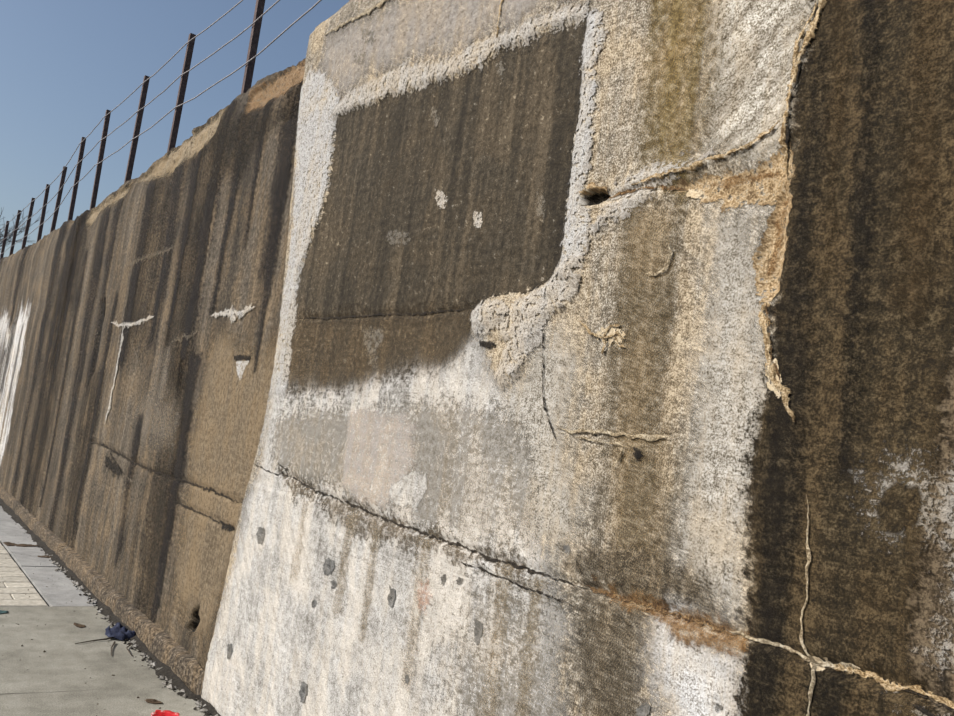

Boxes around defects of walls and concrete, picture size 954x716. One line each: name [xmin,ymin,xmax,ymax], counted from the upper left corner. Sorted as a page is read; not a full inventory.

damp [9,70,303,622]
peeling [201,11,611,716]
crack [542,330,556,440]
crack [253,462,954,716]
damp [576,206,676,716]
crack [609,0,827,198]
peeling [635,0,818,716]
damp [733,0,954,716]